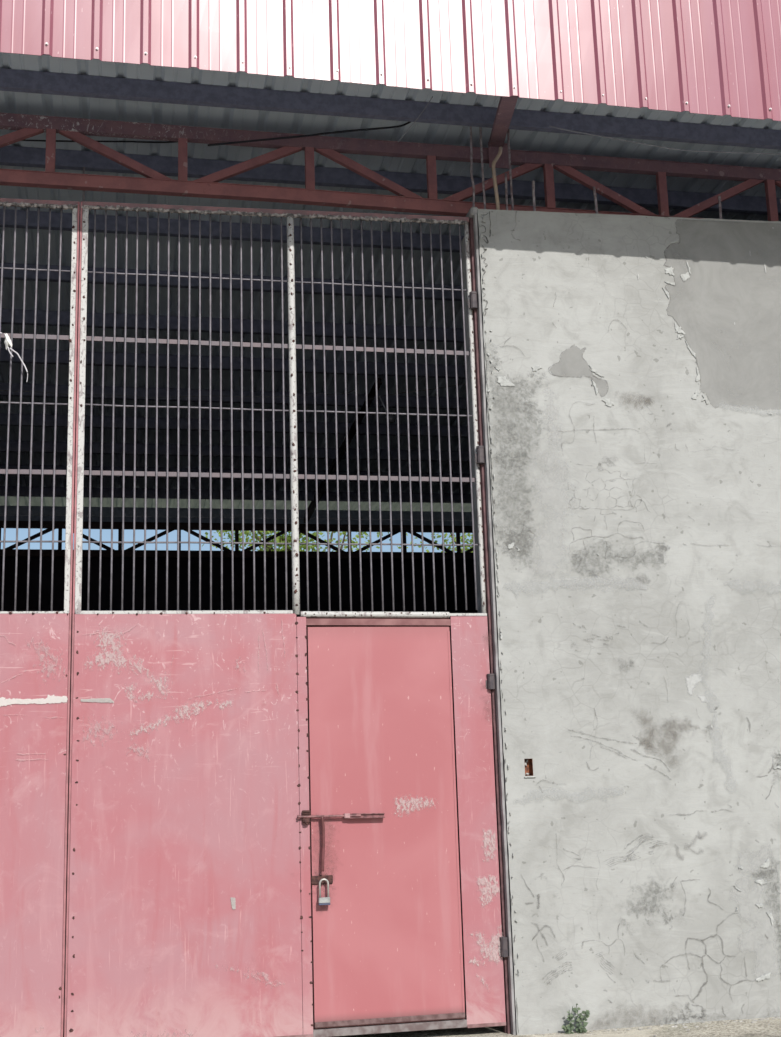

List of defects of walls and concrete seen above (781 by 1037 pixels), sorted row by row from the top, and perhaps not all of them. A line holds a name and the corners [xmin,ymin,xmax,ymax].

peeling [662,196,781,415]
spalling [470,126,500,597]
peeling [531,345,614,407]
peeling [0,695,68,707]
peeling [395,797,434,813]
peeling [478,876,500,905]
peeling [470,933,502,966]